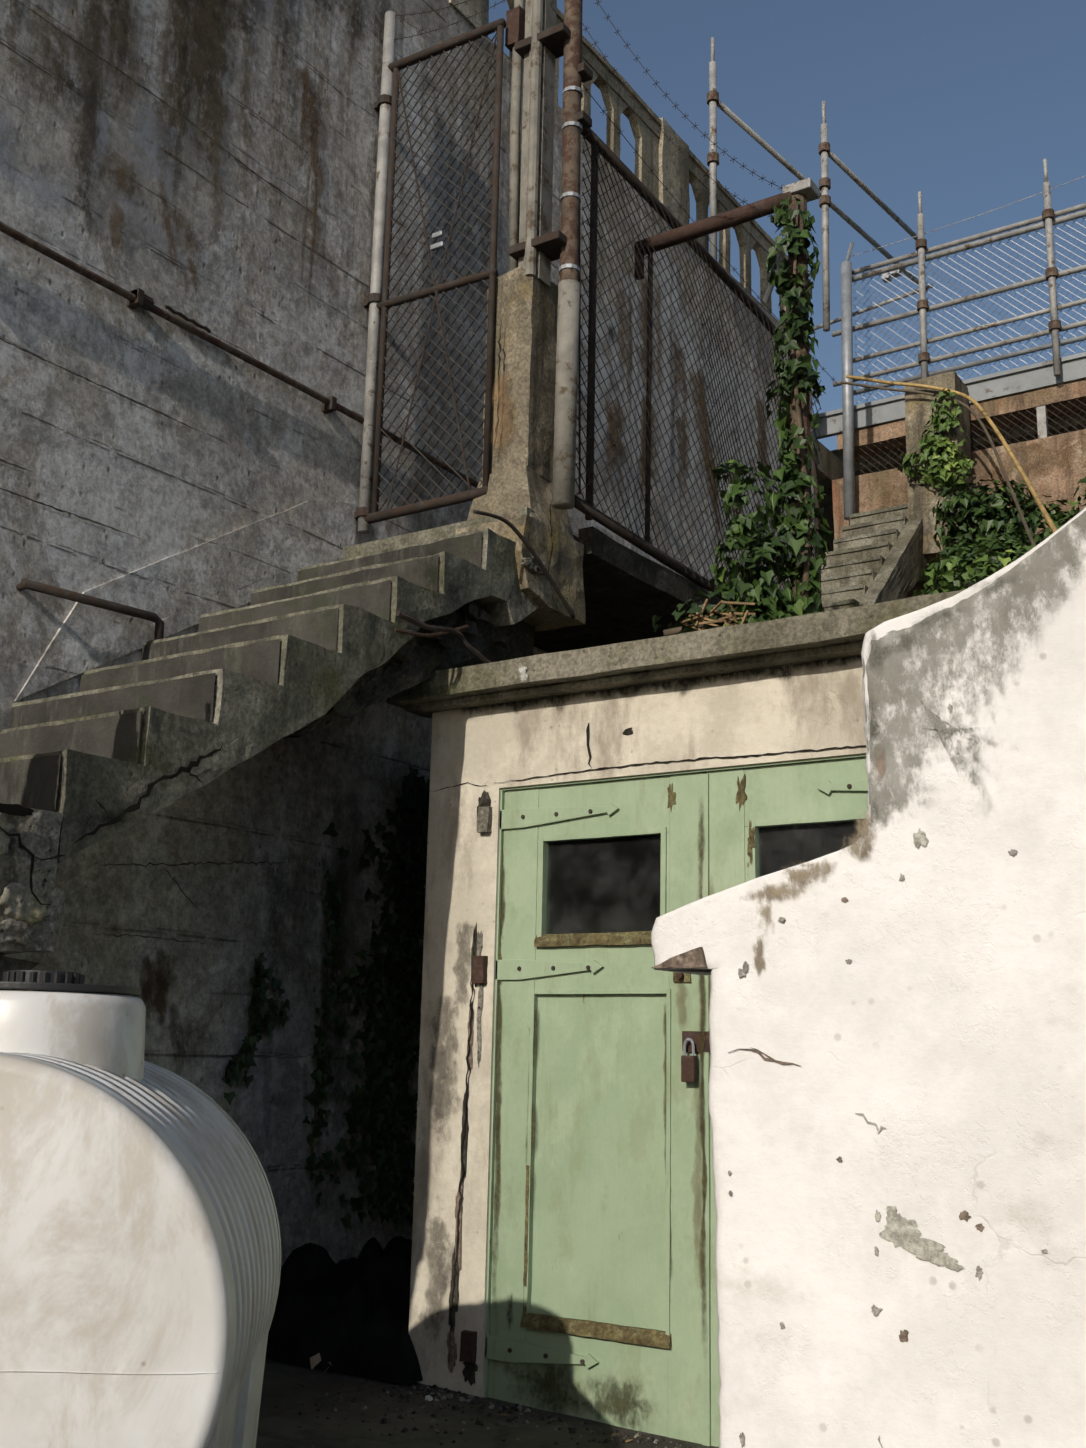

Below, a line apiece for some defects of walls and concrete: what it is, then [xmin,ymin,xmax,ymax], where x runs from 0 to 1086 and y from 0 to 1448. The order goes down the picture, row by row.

rust [300,67,325,290]
rust [606,281,742,523]
spalling [286,599,509,737]
peeling [0,803,54,947]
crack [0,742,288,944]
damp [431,924,470,1131]
peeling [738,940,764,978]
crack [728,1047,800,1066]
peeling [751,863,830,923]
damp [424,1221,451,1337]
spalling [874,1206,984,1281]
damp [506,1364,643,1428]